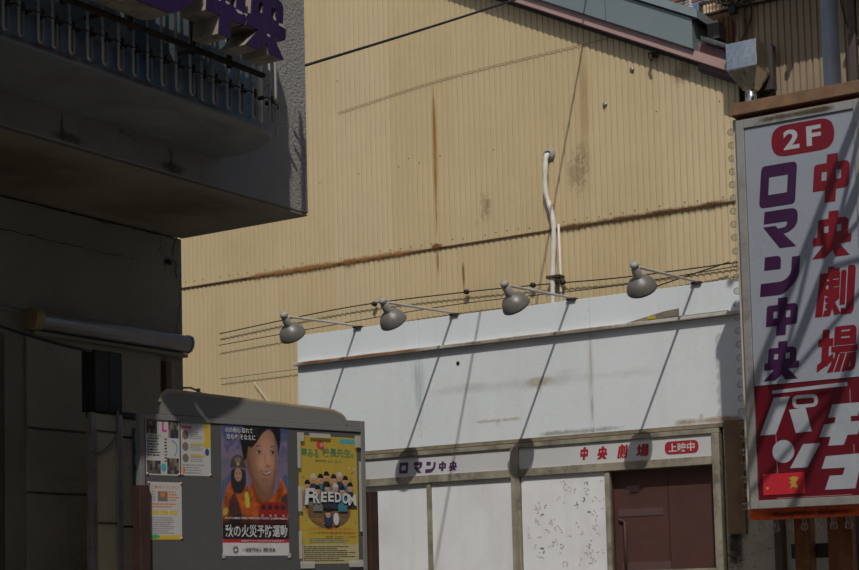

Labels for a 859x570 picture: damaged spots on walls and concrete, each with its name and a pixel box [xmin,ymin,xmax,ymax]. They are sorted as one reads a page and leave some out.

crack [0,195,179,240]
rust [560,201,721,229]
peeling [528,480,604,567]